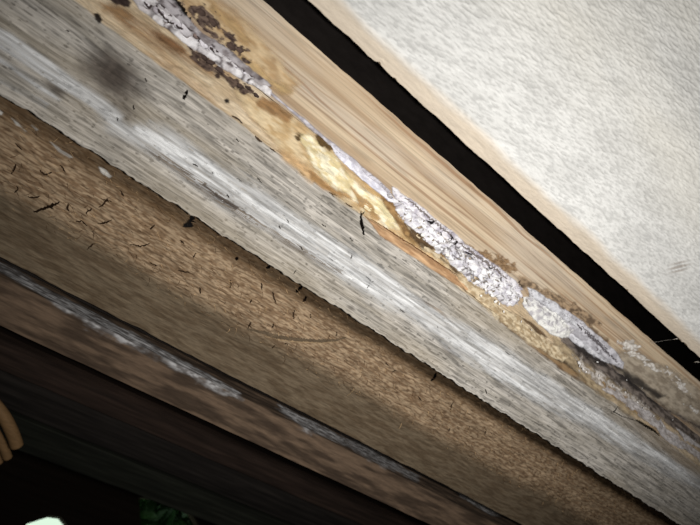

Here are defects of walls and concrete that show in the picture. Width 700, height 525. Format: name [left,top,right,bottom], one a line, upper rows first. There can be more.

leakage [0,29,122,120]
peeling [196,9,218,28]
leakage [102,0,700,488]
leakage [0,264,241,399]